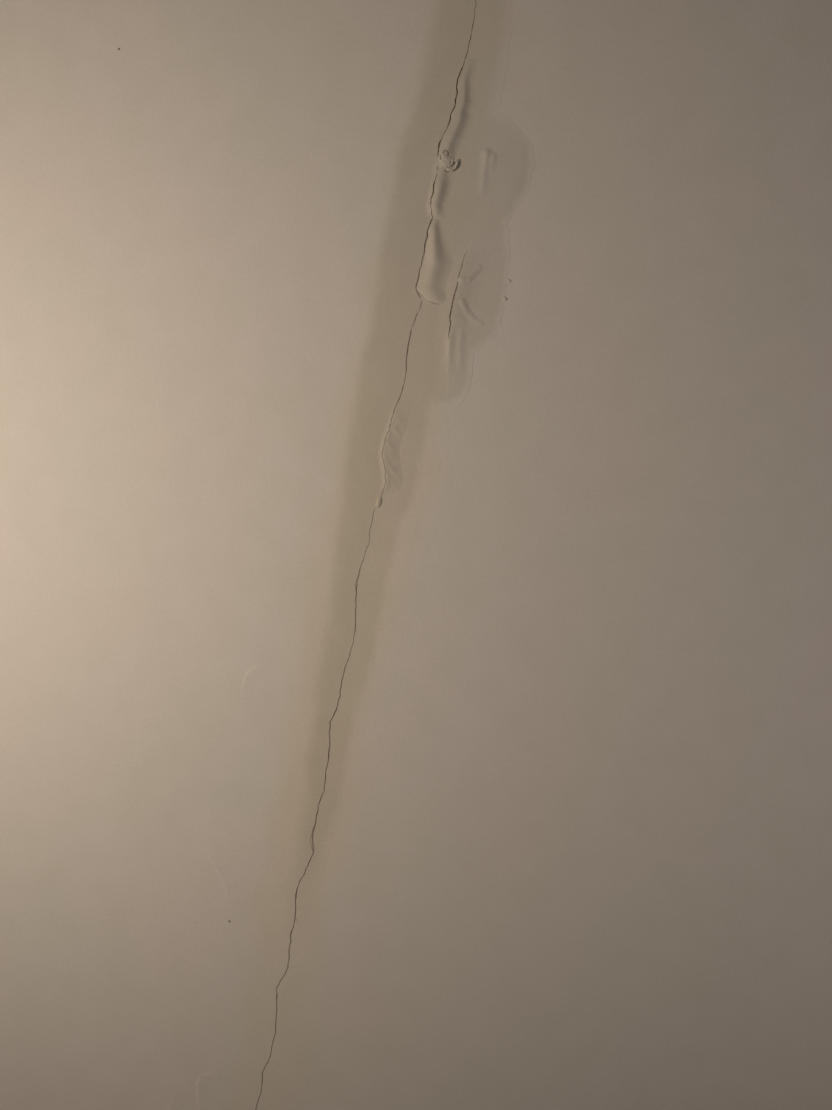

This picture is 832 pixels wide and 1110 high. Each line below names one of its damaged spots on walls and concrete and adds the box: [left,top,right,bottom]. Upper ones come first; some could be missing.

crack [255,5,476,1110]